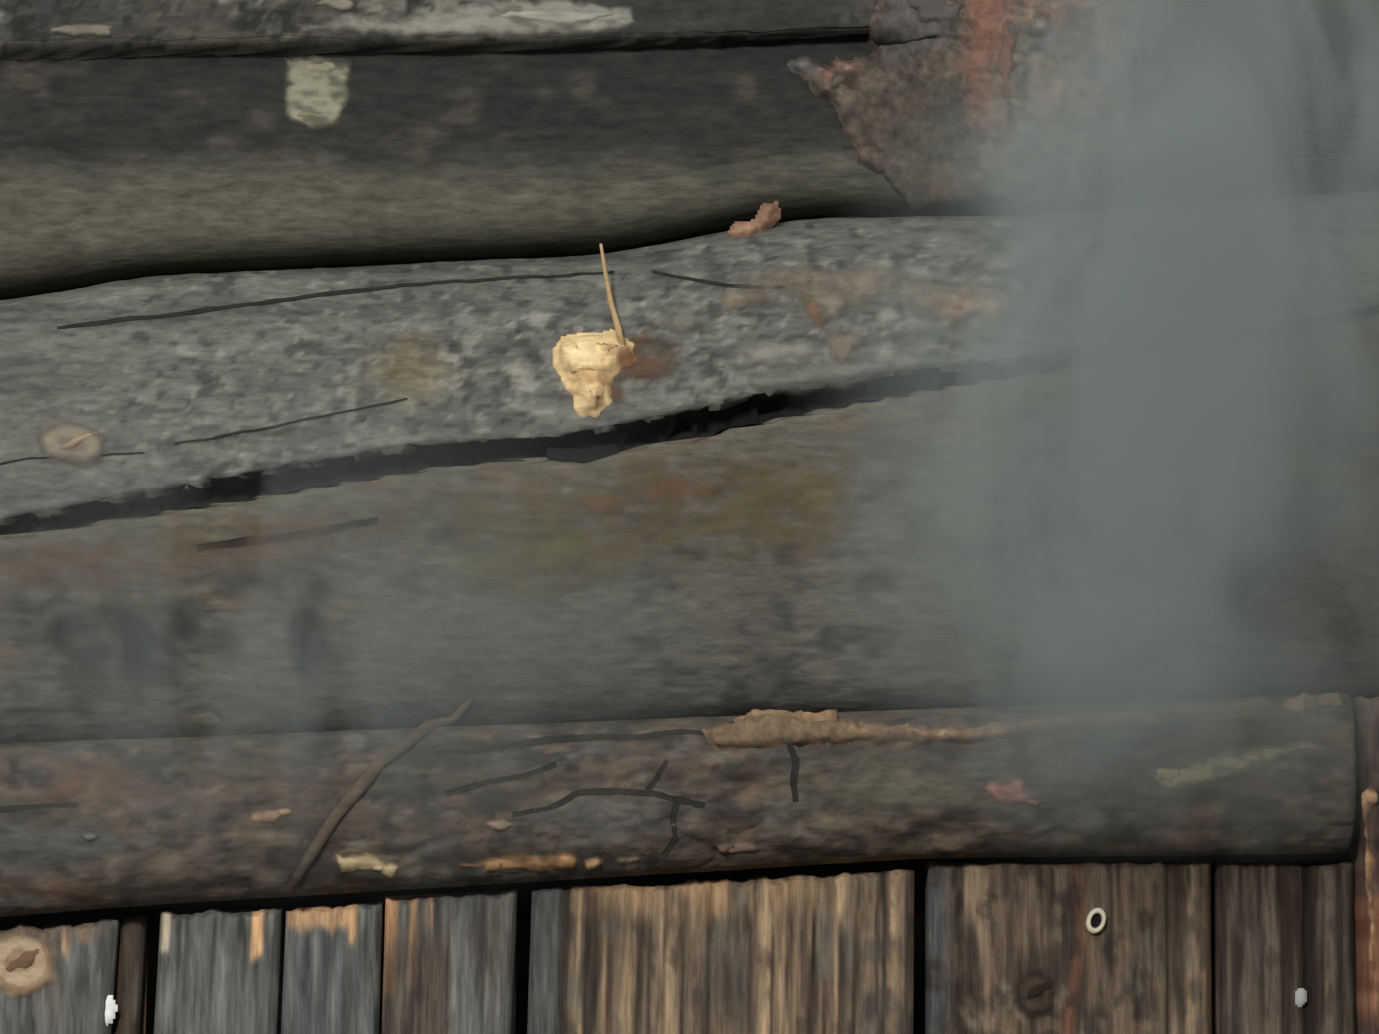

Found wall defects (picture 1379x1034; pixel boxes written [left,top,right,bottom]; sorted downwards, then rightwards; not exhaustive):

spalling [286,58,349,127]
crack [57,271,614,329]
crack [652,270,810,289]
crack [0,305,1379,538]
crack [196,517,379,551]
peeling [734,709,844,722]
crack [435,723,734,857]
crack [787,745,799,802]